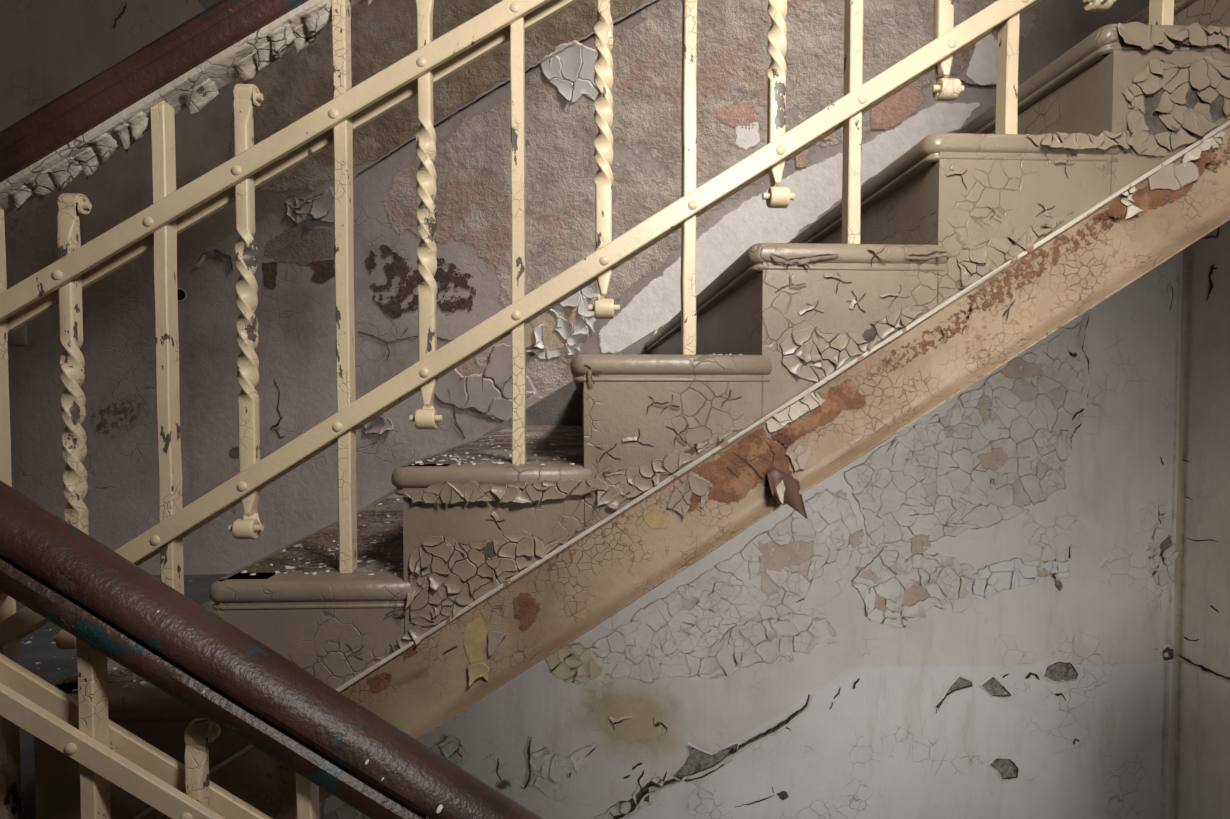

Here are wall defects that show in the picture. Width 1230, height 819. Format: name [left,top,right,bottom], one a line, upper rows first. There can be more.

flaking render [234,0,333,145]
flaking render [351,0,844,319]
flaking render [862,0,934,85]
crack [960,80,996,88]
peeling [1026,22,1230,221]
peeling [435,228,681,422]
crack [770,246,951,316]
corrosion [877,146,1230,373]
crack [1204,226,1220,301]
peeling [545,307,1084,685]
crack [1177,637,1230,684]
crack [614,678,860,819]